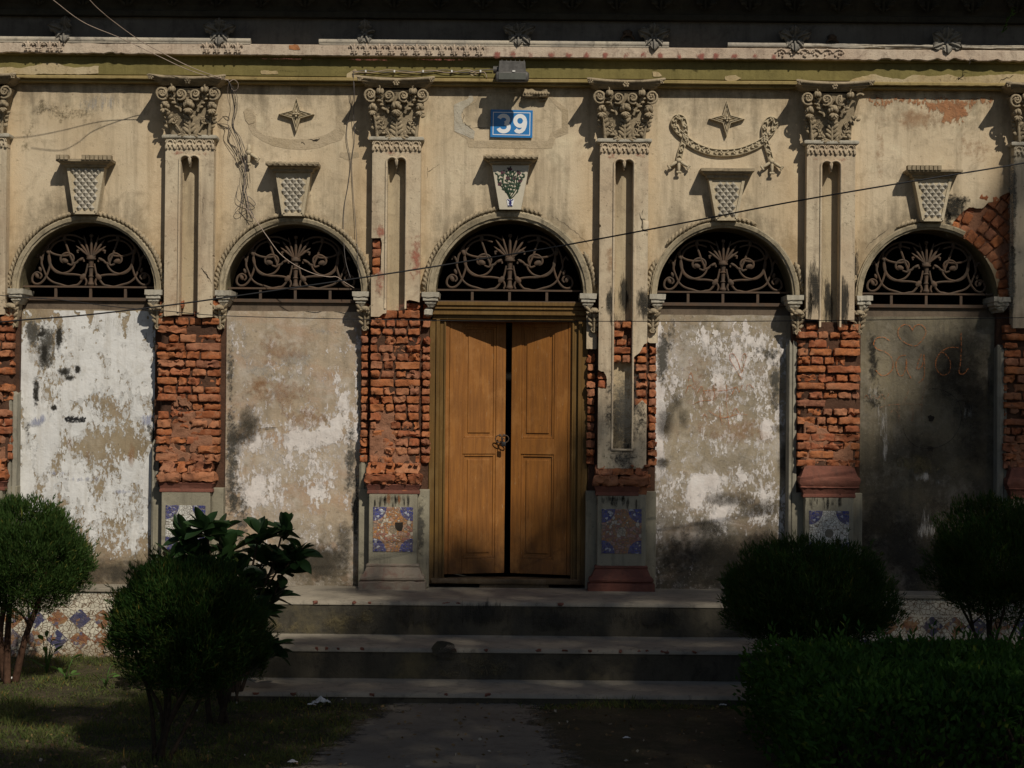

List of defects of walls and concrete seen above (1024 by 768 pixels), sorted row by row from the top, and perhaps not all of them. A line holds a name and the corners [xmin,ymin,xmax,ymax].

flaking render [869,96,993,125]
flaking render [951,192,1010,297]
leakage [25,321,80,380]
peeling [0,298,431,564]
leakage [225,351,257,540]
flaking render [586,307,861,549]
flaking render [1002,324,1024,500]